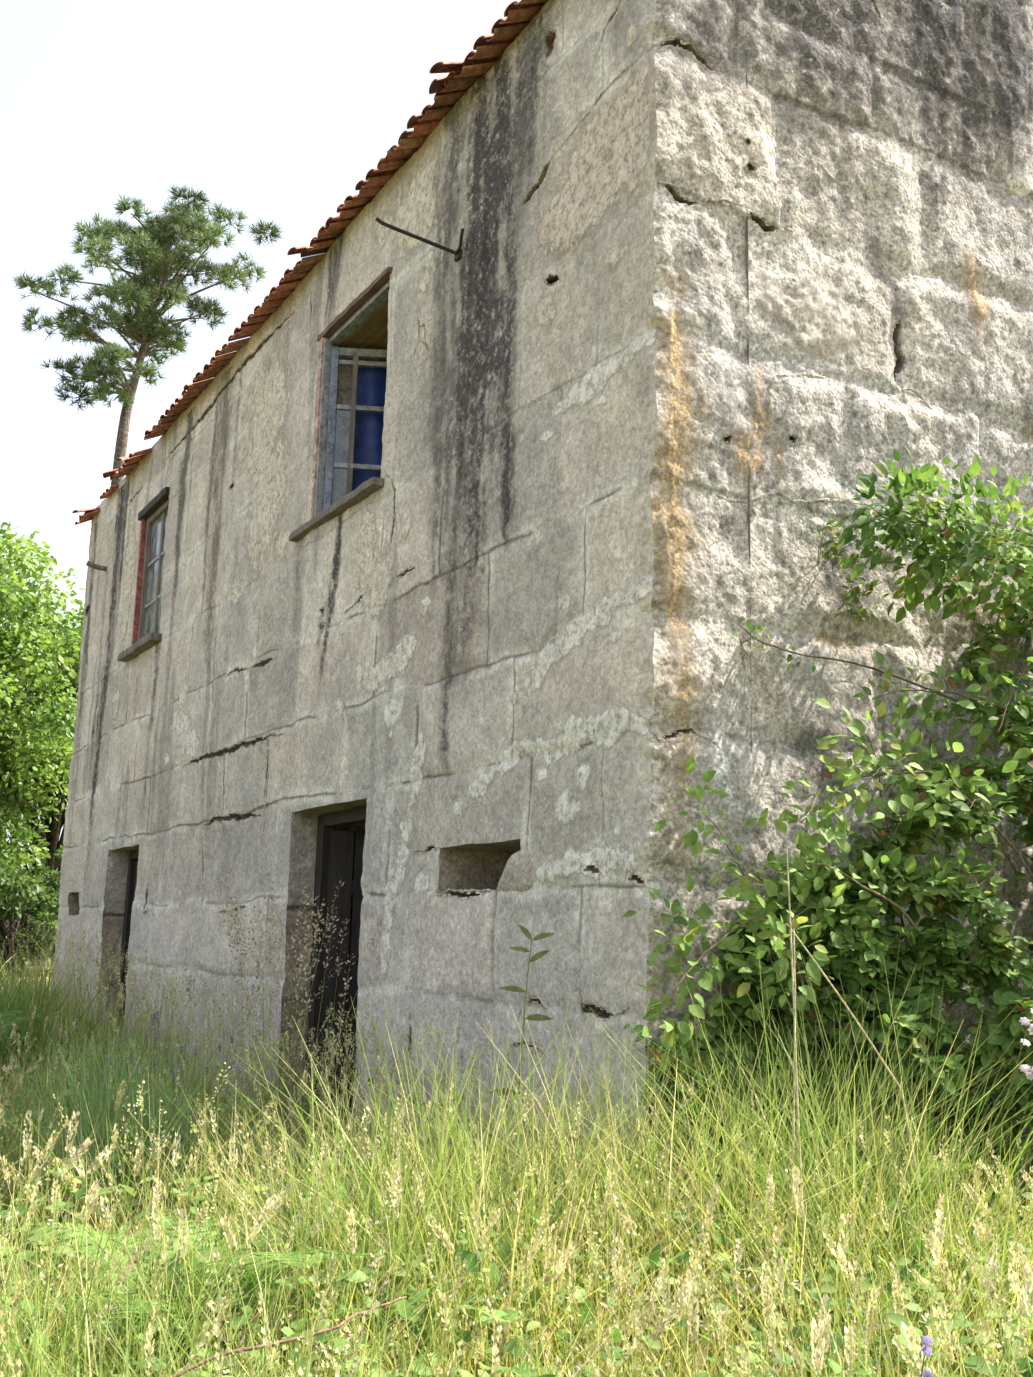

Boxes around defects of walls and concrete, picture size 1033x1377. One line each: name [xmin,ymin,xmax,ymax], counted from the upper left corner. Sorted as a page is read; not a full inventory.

crack [507,0,722,248]
leakage [683,0,1033,203]
leakage [429,15,547,756]
rust [652,315,705,637]